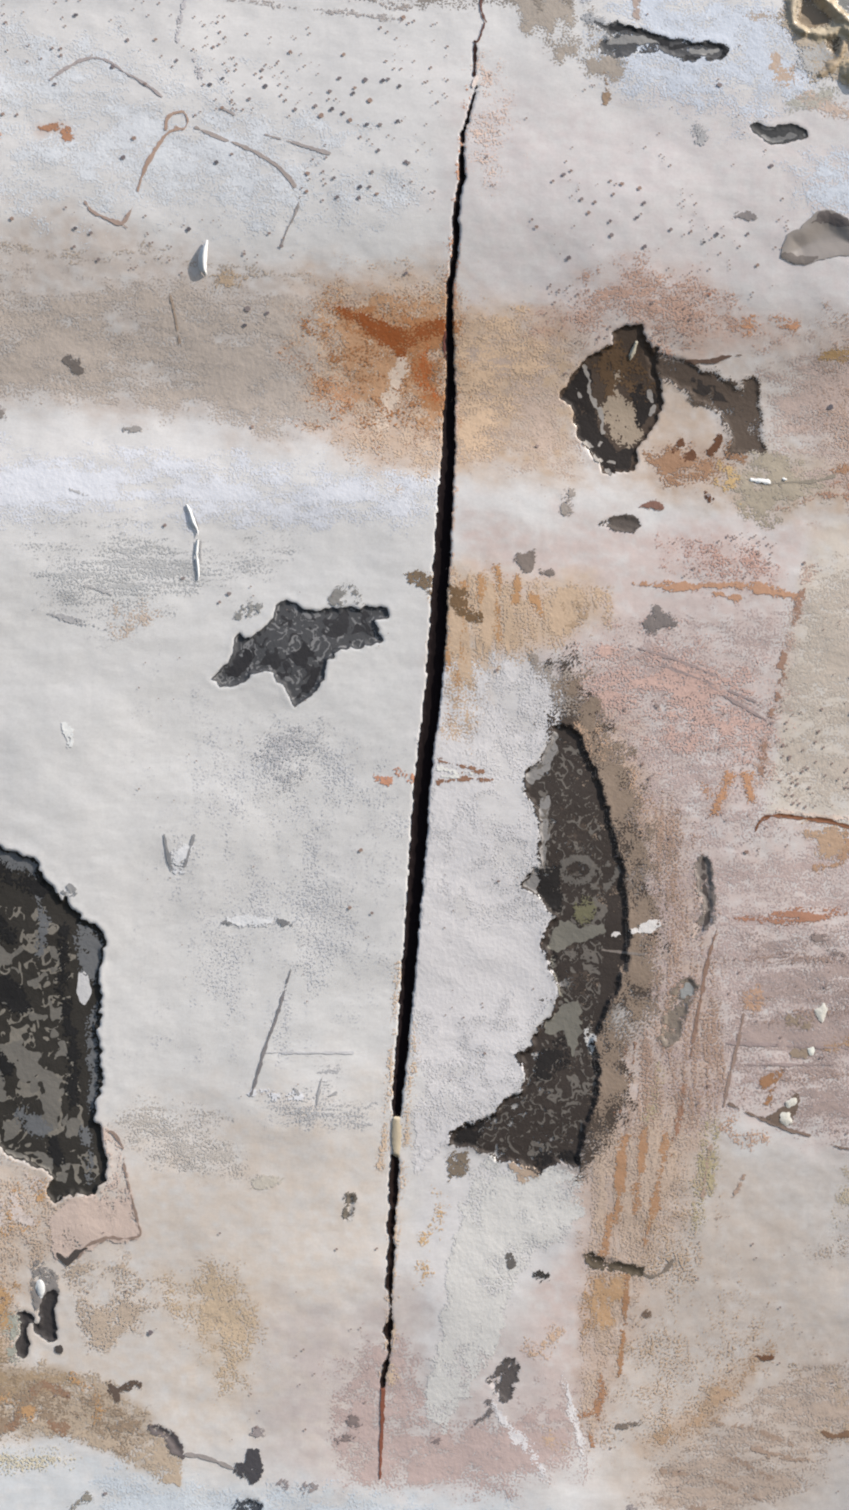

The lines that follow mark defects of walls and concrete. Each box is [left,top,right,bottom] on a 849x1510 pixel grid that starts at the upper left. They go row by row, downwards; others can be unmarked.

peeling [581,12,730,70]
peeling [750,122,808,144]
crack [392,0,487,1117]
peeling [559,324,767,475]
rust [263,38,849,1488]
peeling [0,846,142,1368]
peeling [212,548,849,1510]
crack [379,1154,400,1479]
peeling [67,1491,94,1510]